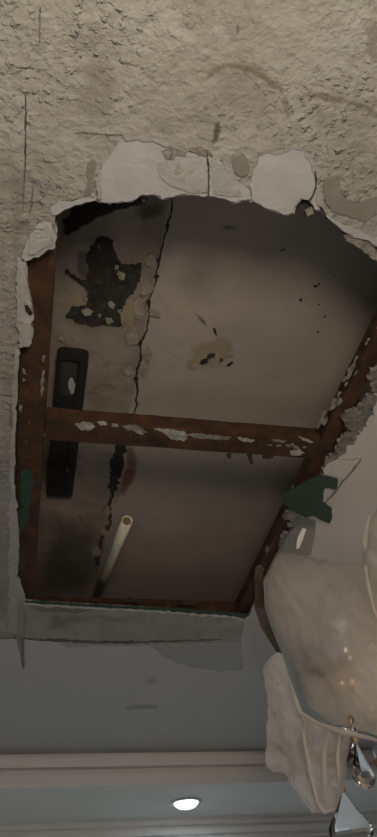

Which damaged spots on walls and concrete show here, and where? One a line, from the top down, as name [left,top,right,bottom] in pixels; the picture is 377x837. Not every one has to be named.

crack [22,94,35,213]
crack [204,153,212,197]
crack [124,197,173,414]
peeling [0,135,377,669]
crack [92,445,127,566]